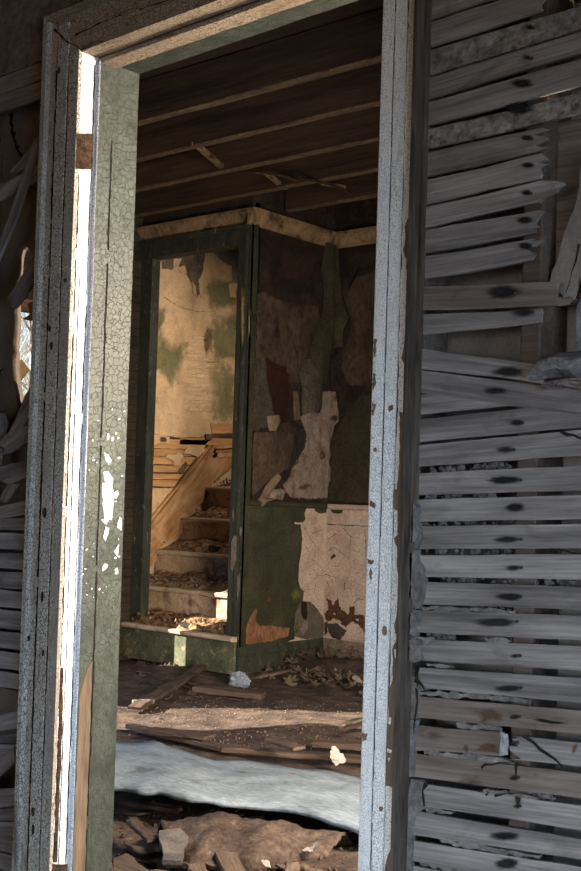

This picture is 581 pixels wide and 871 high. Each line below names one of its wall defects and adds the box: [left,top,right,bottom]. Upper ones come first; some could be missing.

flaking render [153,250,250,488]
flaking render [265,359,290,422]
flaking render [283,391,343,514]
peeling [85,452,123,575]
peeling [231,509,242,599]
peeling [246,609,308,645]
peeling [324,598,365,640]